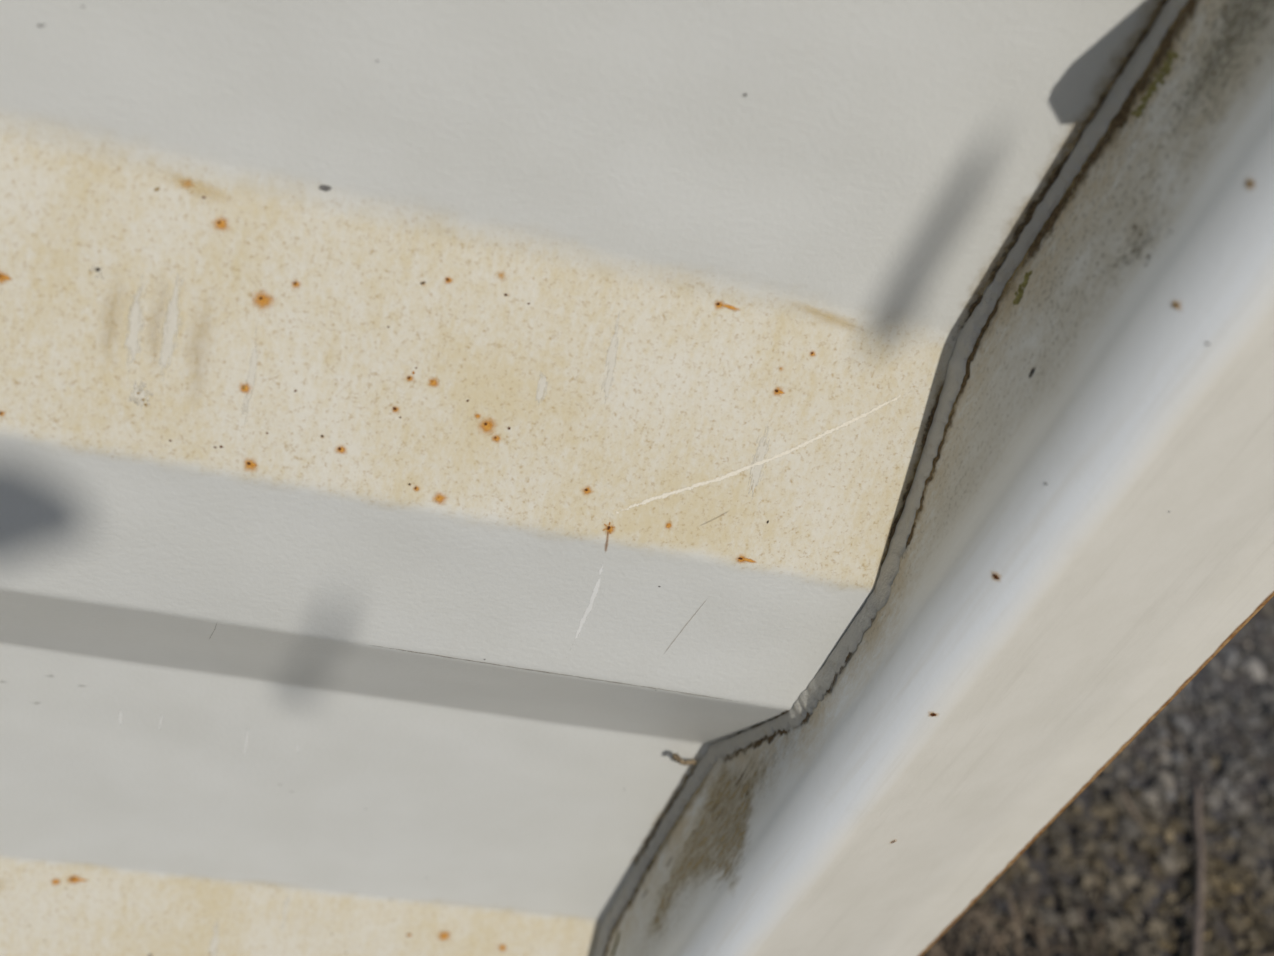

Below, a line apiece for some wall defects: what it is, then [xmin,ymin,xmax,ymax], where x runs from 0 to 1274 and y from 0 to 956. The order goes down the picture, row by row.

rust [256,294,270,307]
rust [476,414,511,441]
crack [802,652,852,724]